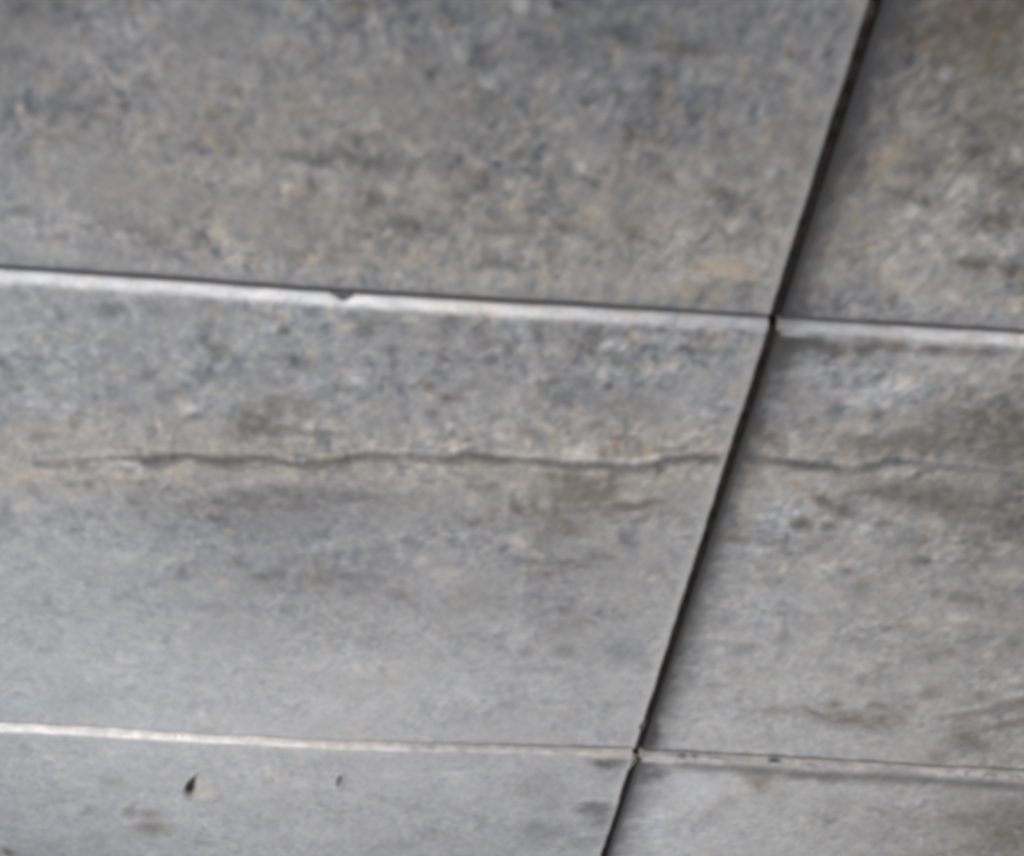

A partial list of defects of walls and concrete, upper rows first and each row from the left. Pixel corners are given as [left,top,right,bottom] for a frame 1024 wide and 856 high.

crack [26,442,1024,480]